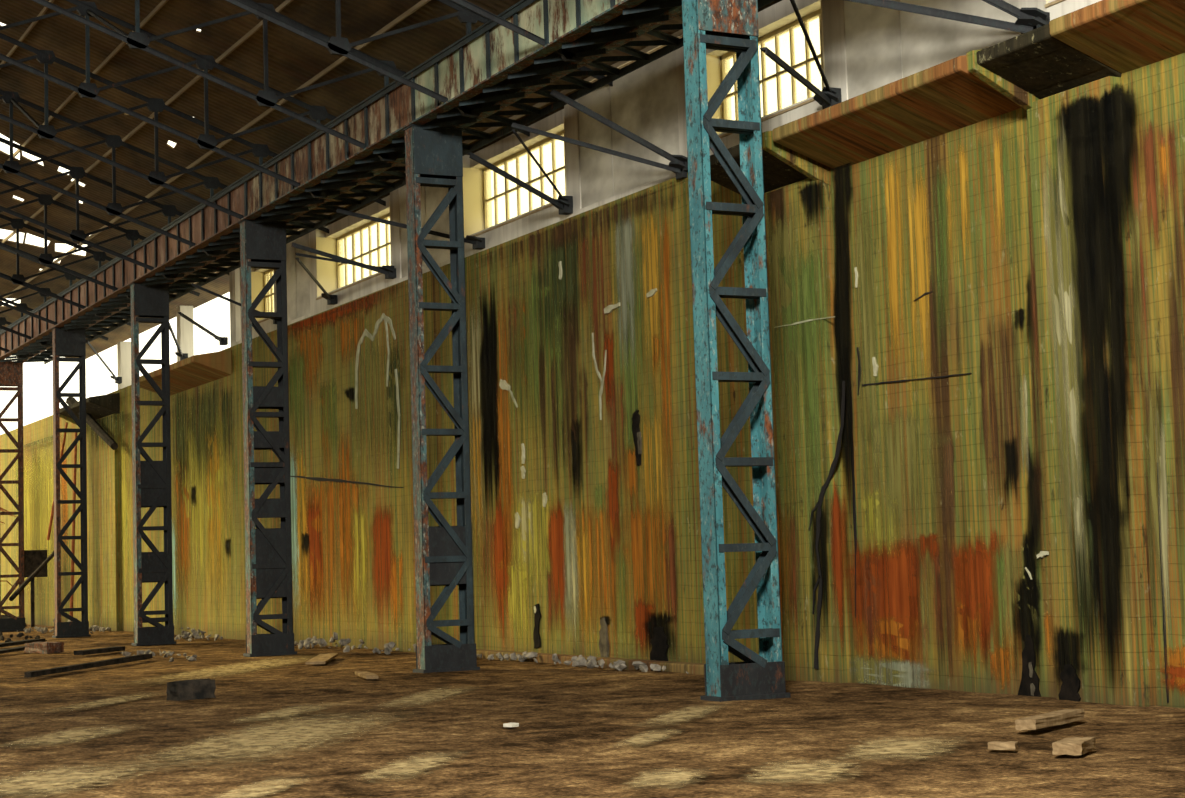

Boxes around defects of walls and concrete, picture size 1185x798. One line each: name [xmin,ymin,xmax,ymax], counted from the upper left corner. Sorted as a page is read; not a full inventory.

corrosion [288,285,402,628]
leakage [469,296,500,604]
corrosion [493,303,525,631]
corrosion [547,210,676,650]
corrosion [776,499,799,637]
leakage [767,163,877,558]
corrosion [831,481,1016,689]
leakage [885,136,1041,582]
leakage [1045,84,1185,680]
corrosion [1163,646,1185,691]